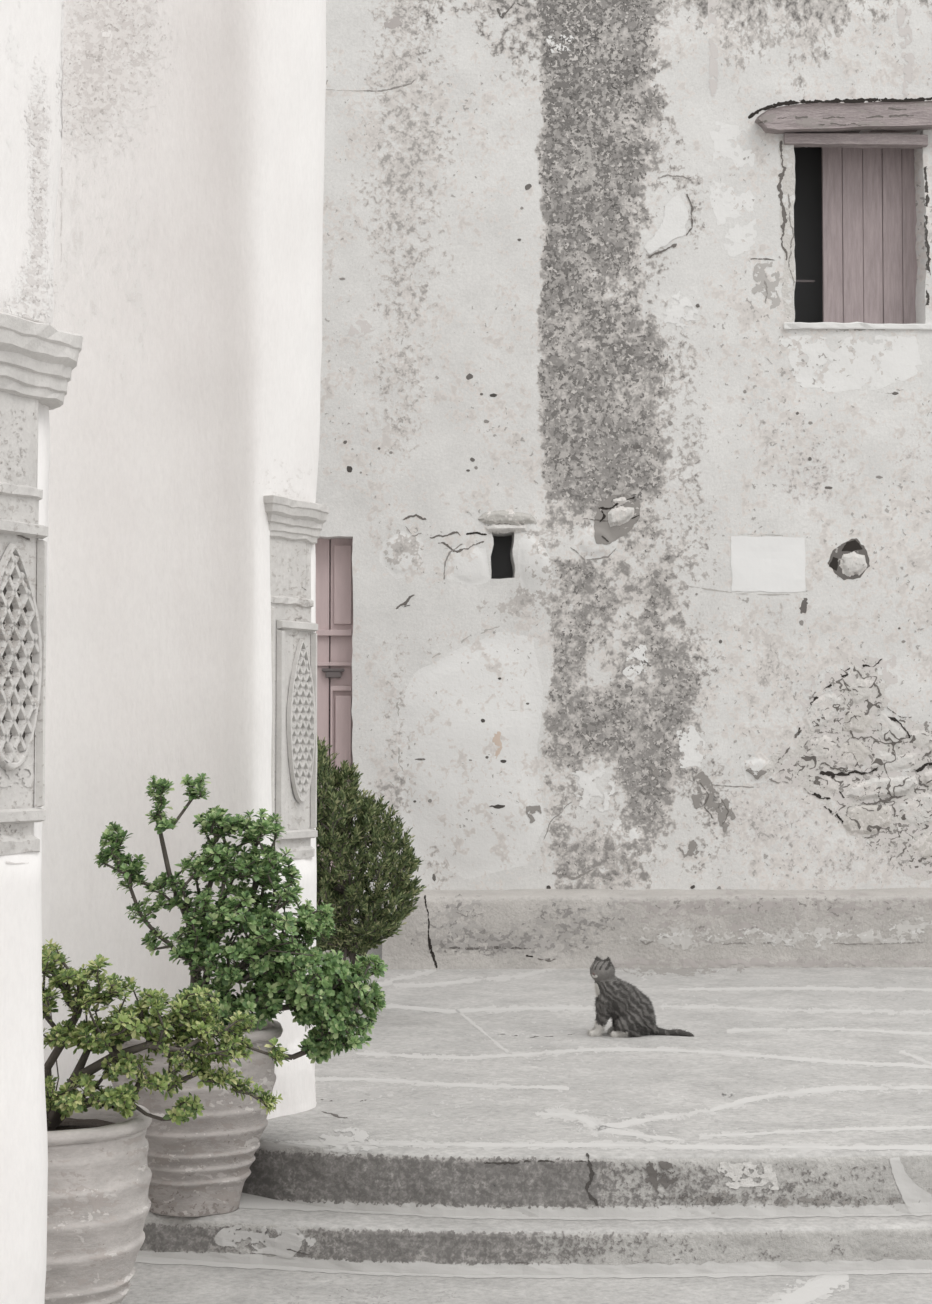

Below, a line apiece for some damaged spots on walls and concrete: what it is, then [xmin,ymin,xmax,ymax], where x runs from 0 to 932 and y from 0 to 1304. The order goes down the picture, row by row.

crack [748,97,932,119]
flaking render [644,194,689,254]
crack [751,141,794,303]
crack [923,166,931,306]
crack [403,514,514,579]
spalling [594,494,641,545]
crack [396,595,414,609]
water stain [242,0,932,1210]
crack [700,659,932,868]
crack [424,895,555,968]
crack [483,1153,598,1206]